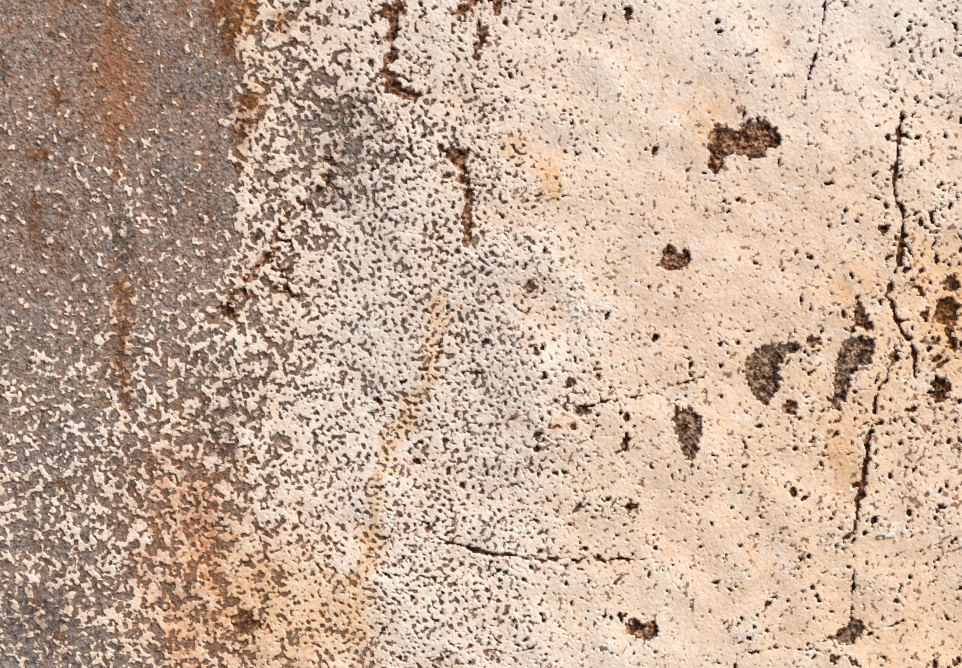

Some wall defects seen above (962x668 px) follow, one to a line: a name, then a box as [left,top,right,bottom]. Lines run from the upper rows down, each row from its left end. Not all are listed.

spalling [881,6,962,80]
spalling [698,112,788,182]
spalling [909,93,962,147]
spalling [871,161,906,266]
spalling [652,242,696,277]
spalling [717,179,962,470]
crack [848,98,927,636]
spalling [657,399,809,504]
crack [418,534,645,564]
spalling [906,482,962,583]
spalling [723,582,789,644]
crack [733,636,830,668]